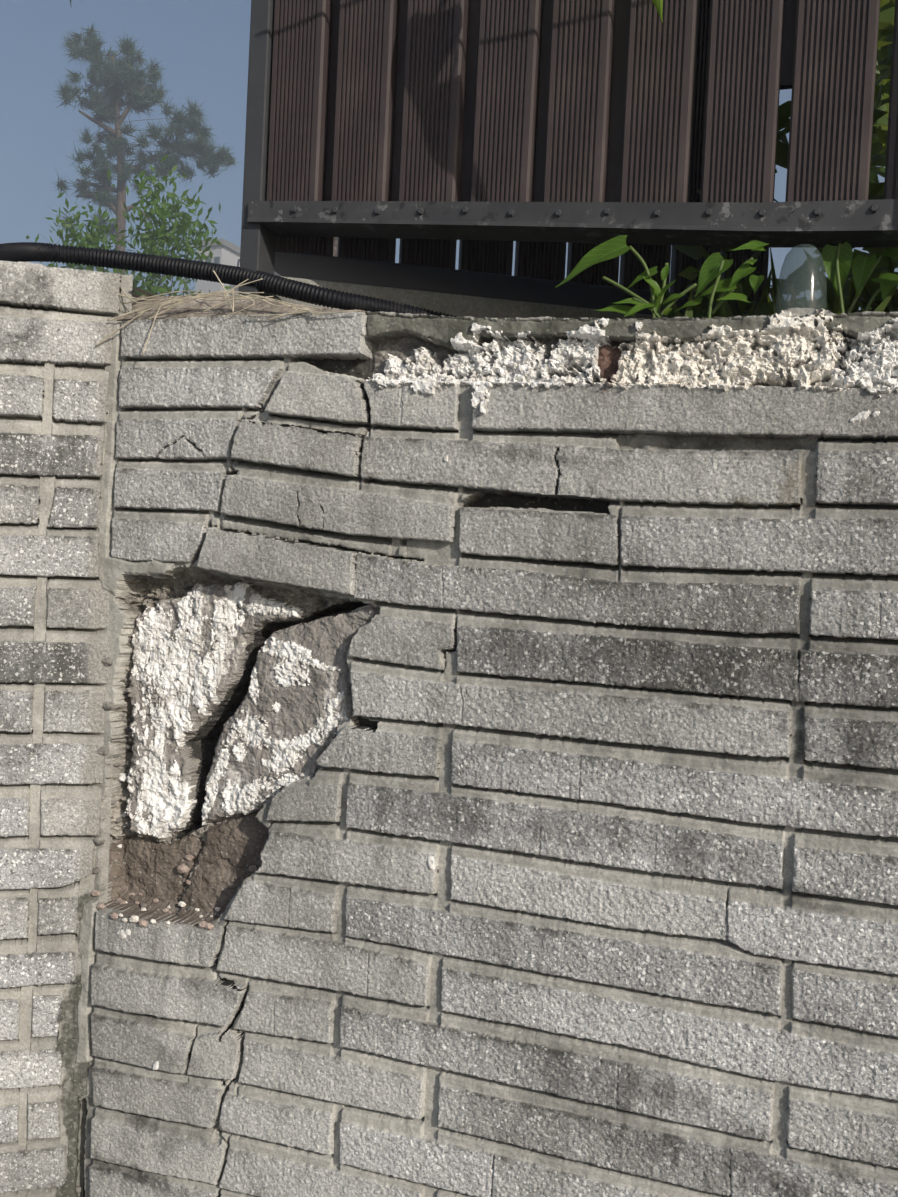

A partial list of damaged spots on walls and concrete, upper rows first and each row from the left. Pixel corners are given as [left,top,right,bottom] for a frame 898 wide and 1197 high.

peeling [366,308,898,414]
crack [249,383,371,482]
crack [210,498,424,561]
spalling [91,568,380,930]
crack [185,920,249,1196]